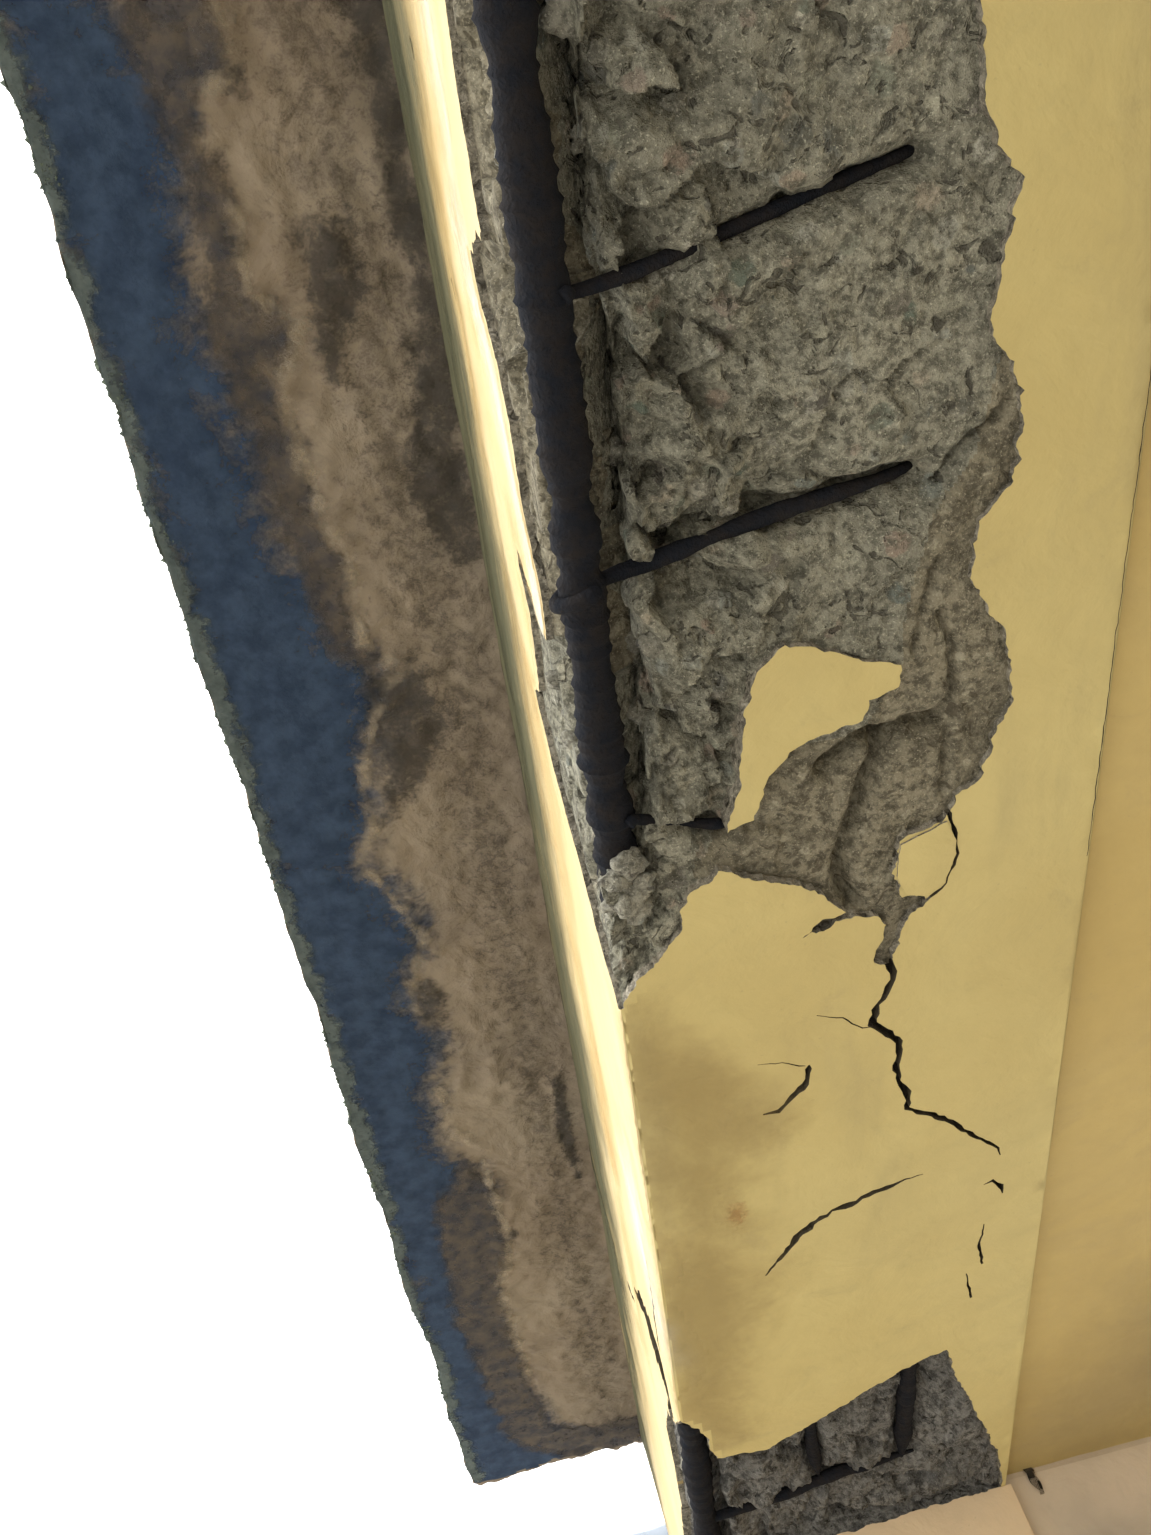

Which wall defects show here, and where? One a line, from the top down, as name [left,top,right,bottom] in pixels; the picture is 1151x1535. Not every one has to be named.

spalling [453,0,1020,1005]
crack [1087,370,1151,855]
leakage [0,0,642,1484]
crack [947,812,957,850]
crack [868,958,1001,1190]
spalling [673,1421,694,1535]
spalling [707,1350,1000,1535]